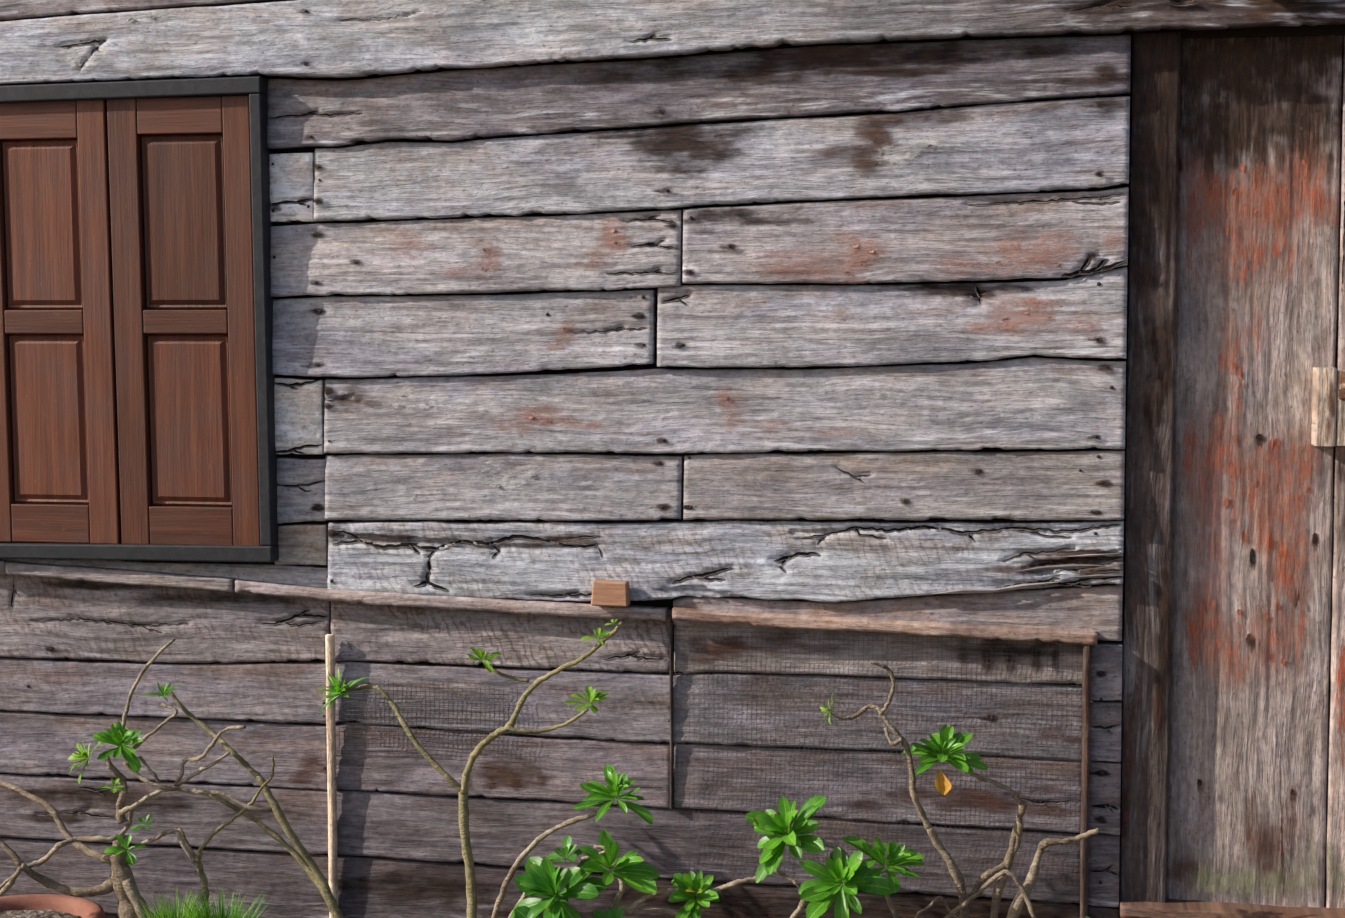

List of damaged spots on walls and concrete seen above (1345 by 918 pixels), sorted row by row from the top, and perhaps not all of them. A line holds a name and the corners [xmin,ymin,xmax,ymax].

water stain [599,125,750,175]
water stain [820,115,903,171]
water stain [1094,32,1345,294]
peeling [1182,154,1339,286]
peeling [1183,321,1312,689]
crack [332,531,602,591]
crack [526,591,592,599]
crack [672,567,732,584]
crack [774,524,1123,588]
peeling [1335,646,1345,737]